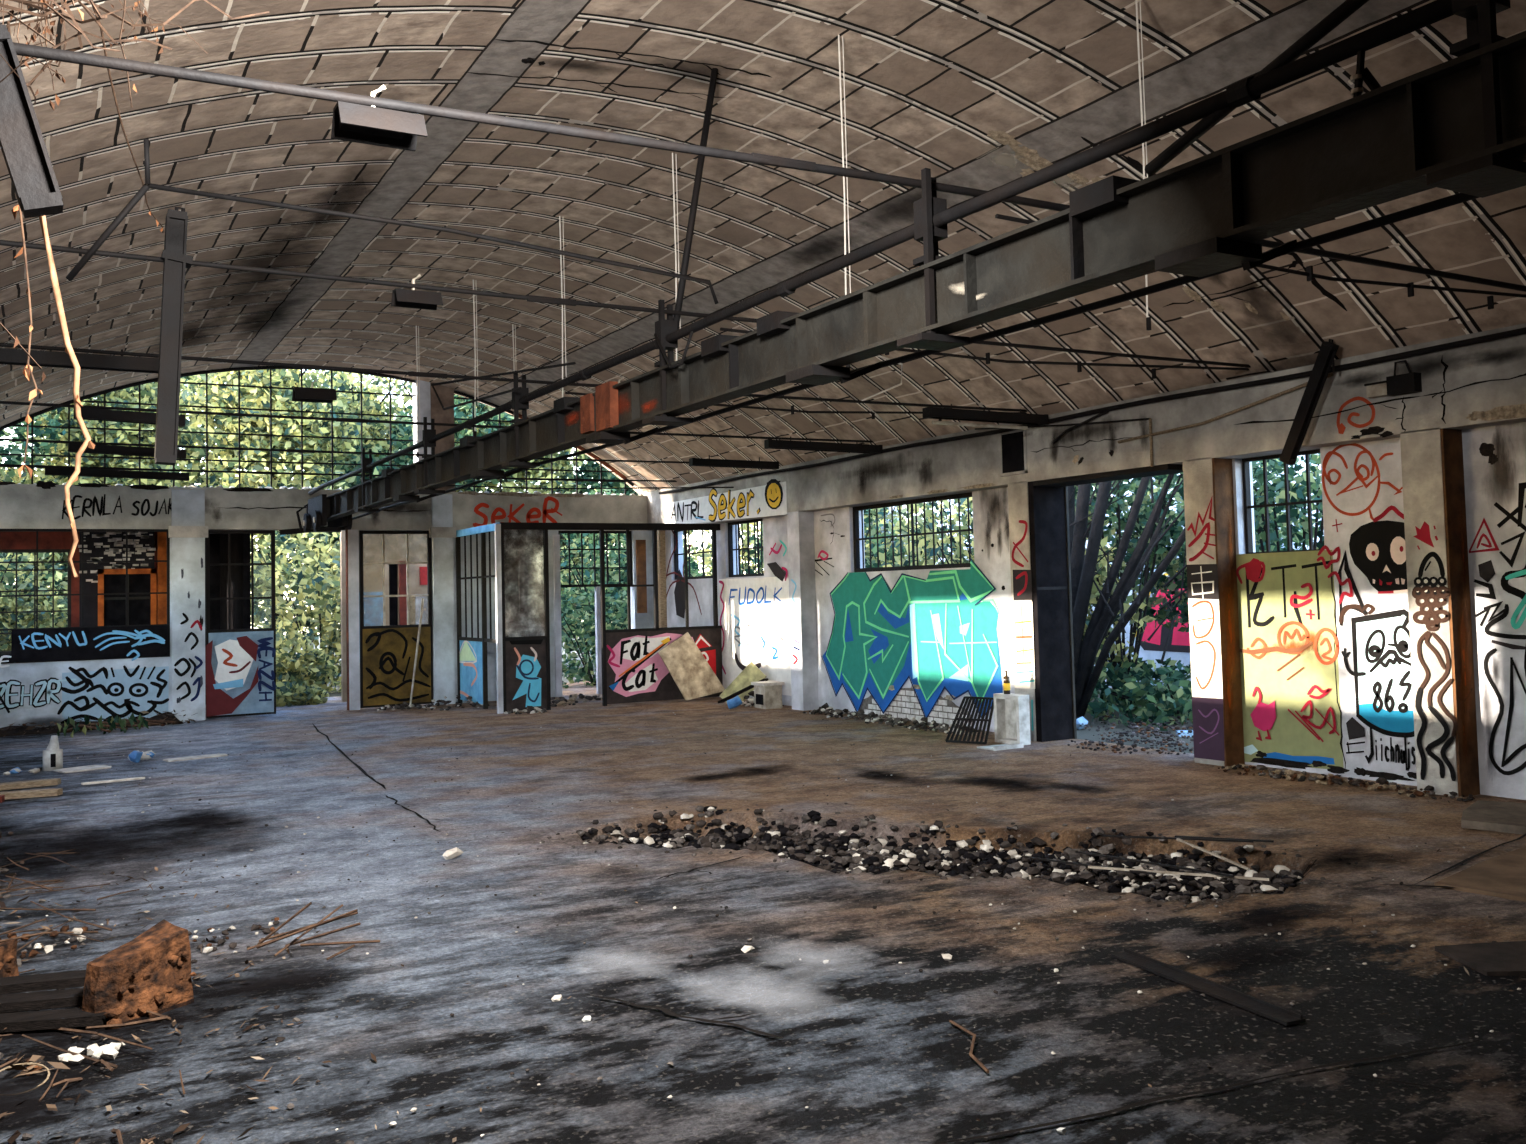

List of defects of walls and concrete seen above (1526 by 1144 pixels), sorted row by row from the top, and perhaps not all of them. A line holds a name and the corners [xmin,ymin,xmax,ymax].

damp [318,182,363,219]
damp [250,303,284,329]
damp [982,490,1010,550]
crack [312,723,468,831]